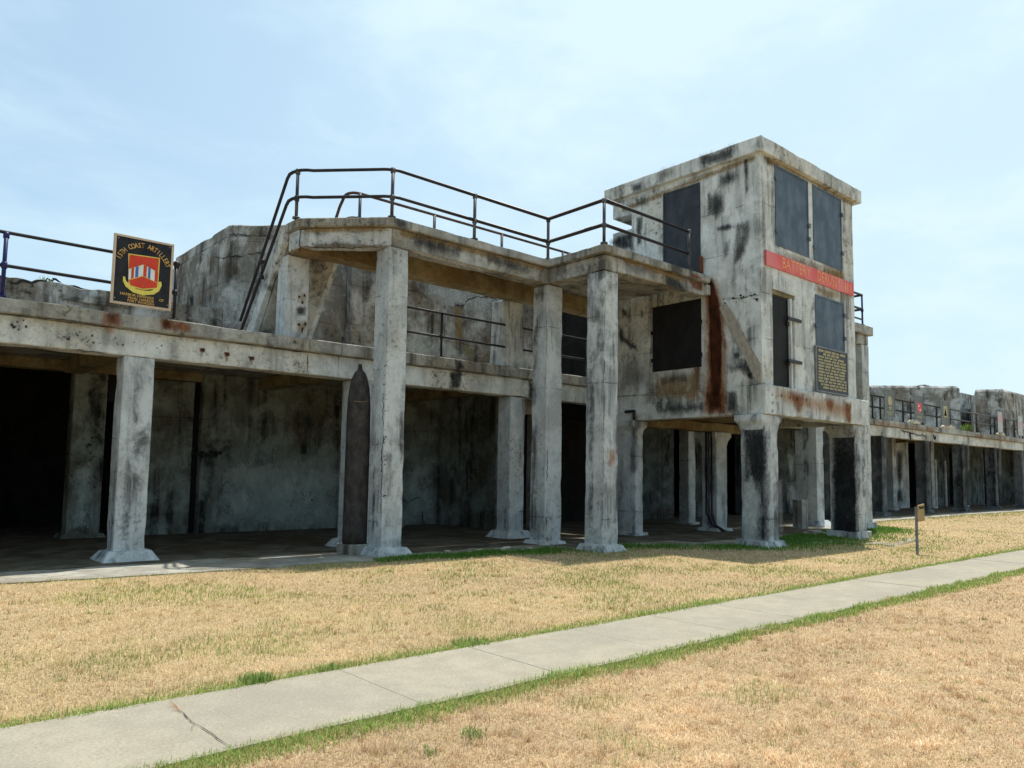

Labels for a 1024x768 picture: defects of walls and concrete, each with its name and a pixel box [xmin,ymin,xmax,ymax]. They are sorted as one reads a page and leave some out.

leakage [610,147,753,291]
leakage [398,221,544,271]
rust [161,319,190,331]
rust [690,274,727,413]
rust [772,394,851,421]
leakage [744,426,782,541]
crack [170,701,228,745]